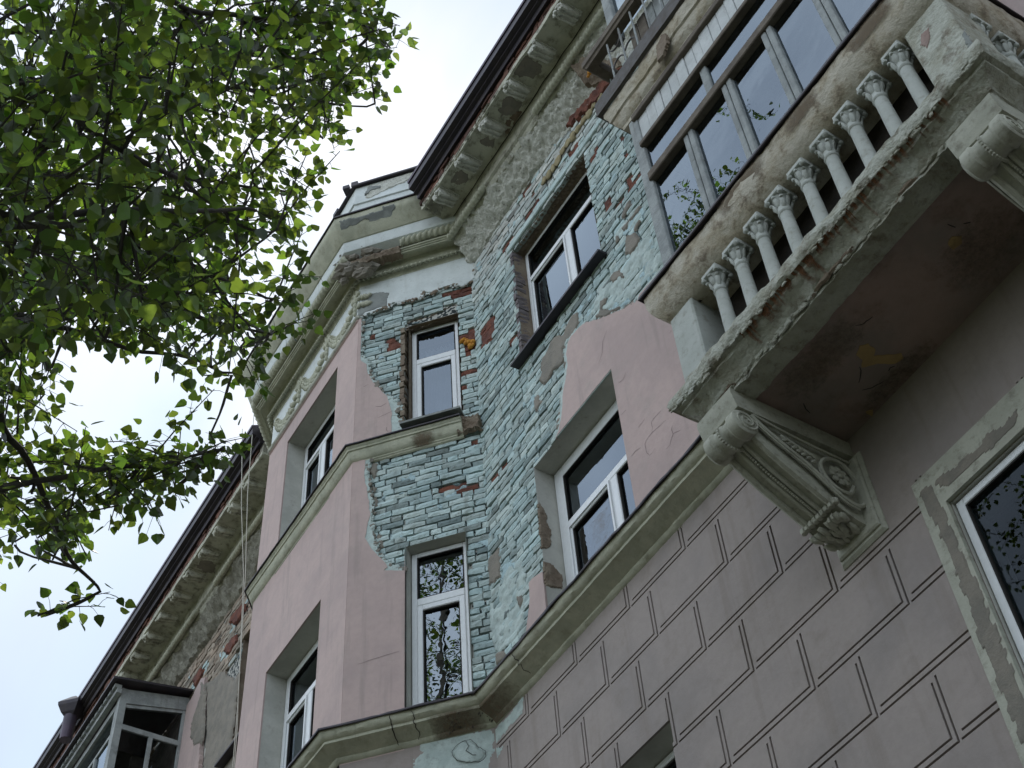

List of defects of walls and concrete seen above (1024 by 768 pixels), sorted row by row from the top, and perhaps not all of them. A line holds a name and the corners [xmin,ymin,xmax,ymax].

spalling [331,246,382,286]
spalling [361,80,663,689]
spalling [669,281,787,413]
spalling [706,144,945,414]
corrosion [739,98,949,343]
spalling [797,97,942,266]
spalling [177,587,252,701]
crack [389,711,420,744]
peeling [413,697,523,768]
peeling [919,409,1024,745]